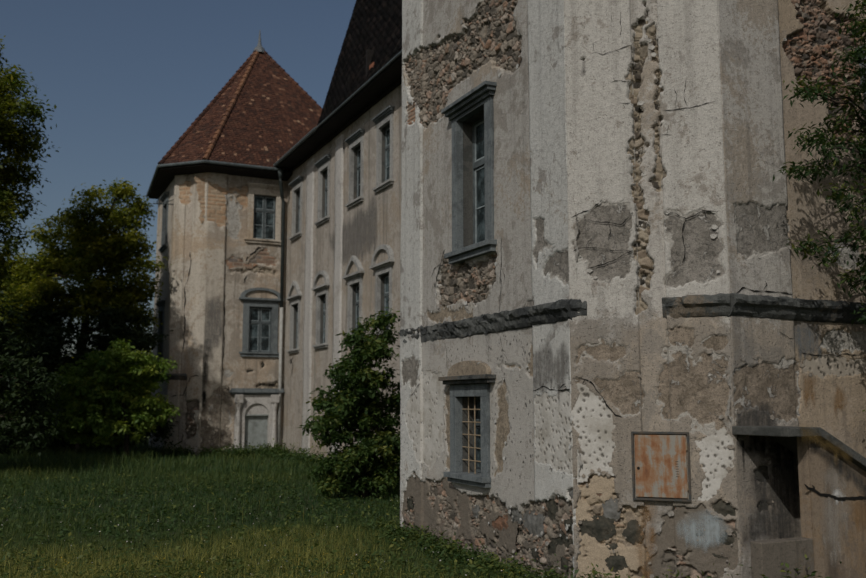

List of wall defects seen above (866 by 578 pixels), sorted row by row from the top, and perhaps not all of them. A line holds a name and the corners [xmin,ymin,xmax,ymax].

flaking render [404,0,522,128]
flaking render [783,0,865,154]
peeling [533,4,667,315]
flaking render [225,248,278,275]
flaking render [422,253,497,324]
peeling [663,208,726,288]
peeling [733,202,792,259]
damp [202,301,221,404]
peeling [182,385,235,455]
flaking render [402,387,745,578]
damp [736,405,798,540]
crack [804,484,866,501]